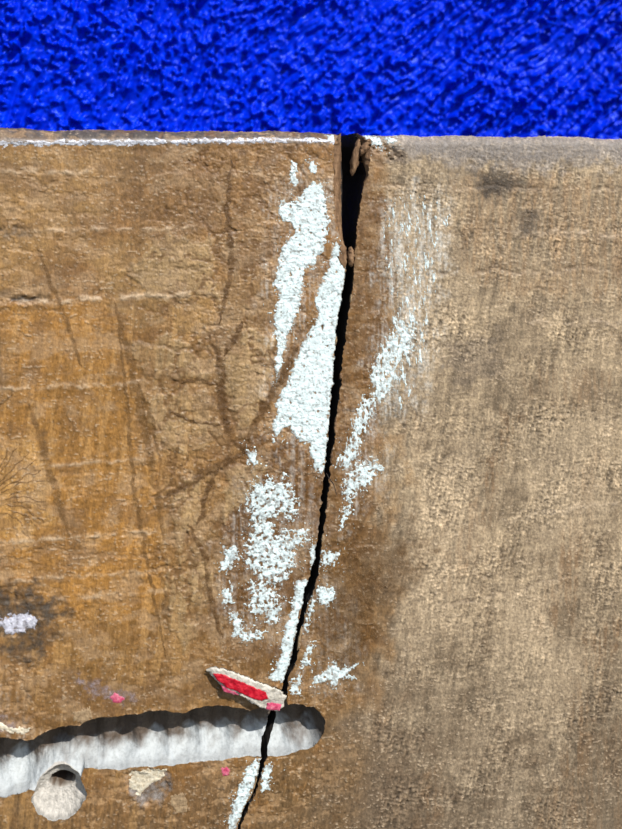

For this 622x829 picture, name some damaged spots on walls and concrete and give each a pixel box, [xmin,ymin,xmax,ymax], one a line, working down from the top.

crack [236,133,372,829]
peeling [0,722,30,735]
peeling [128,766,167,796]
peeling [170,792,187,813]
peeling [223,758,278,829]